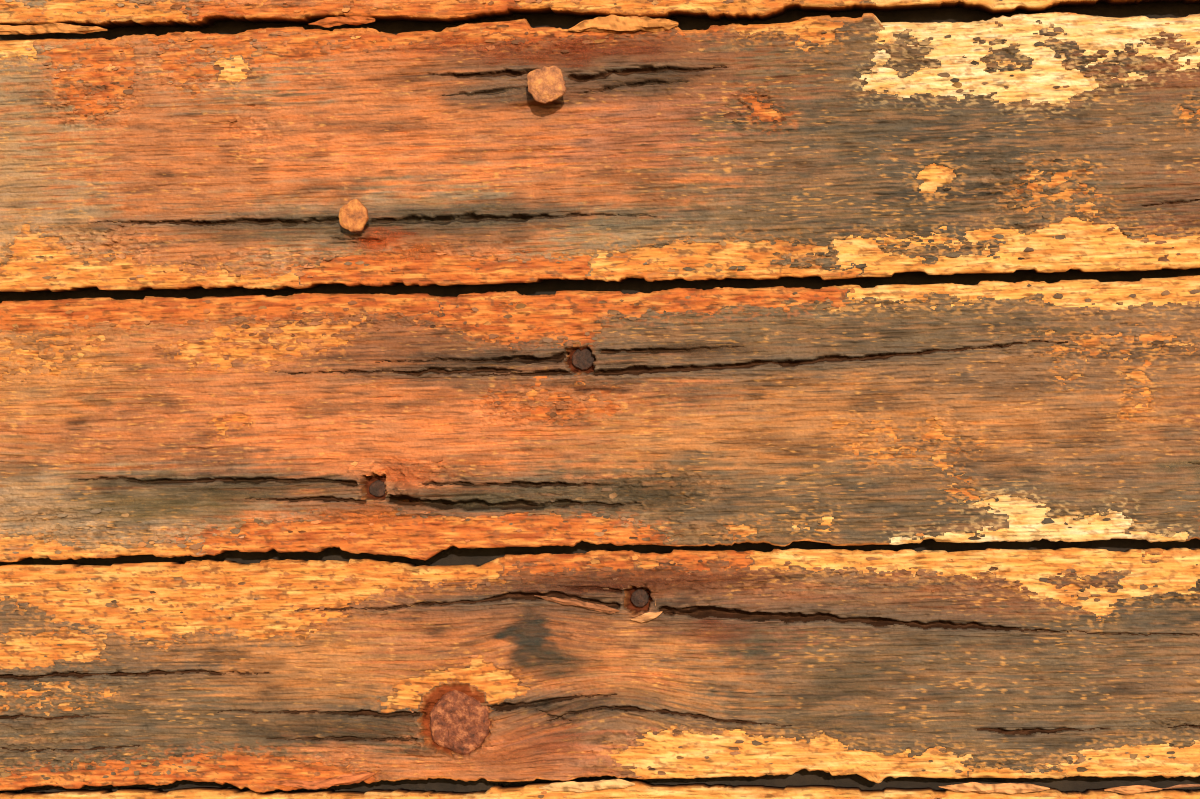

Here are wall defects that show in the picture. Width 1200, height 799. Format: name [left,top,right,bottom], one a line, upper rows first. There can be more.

peeling [0,0,1200,125]
crack [275,340,1068,377]
crack [78,477,641,511]
peeling [0,413,1200,716]